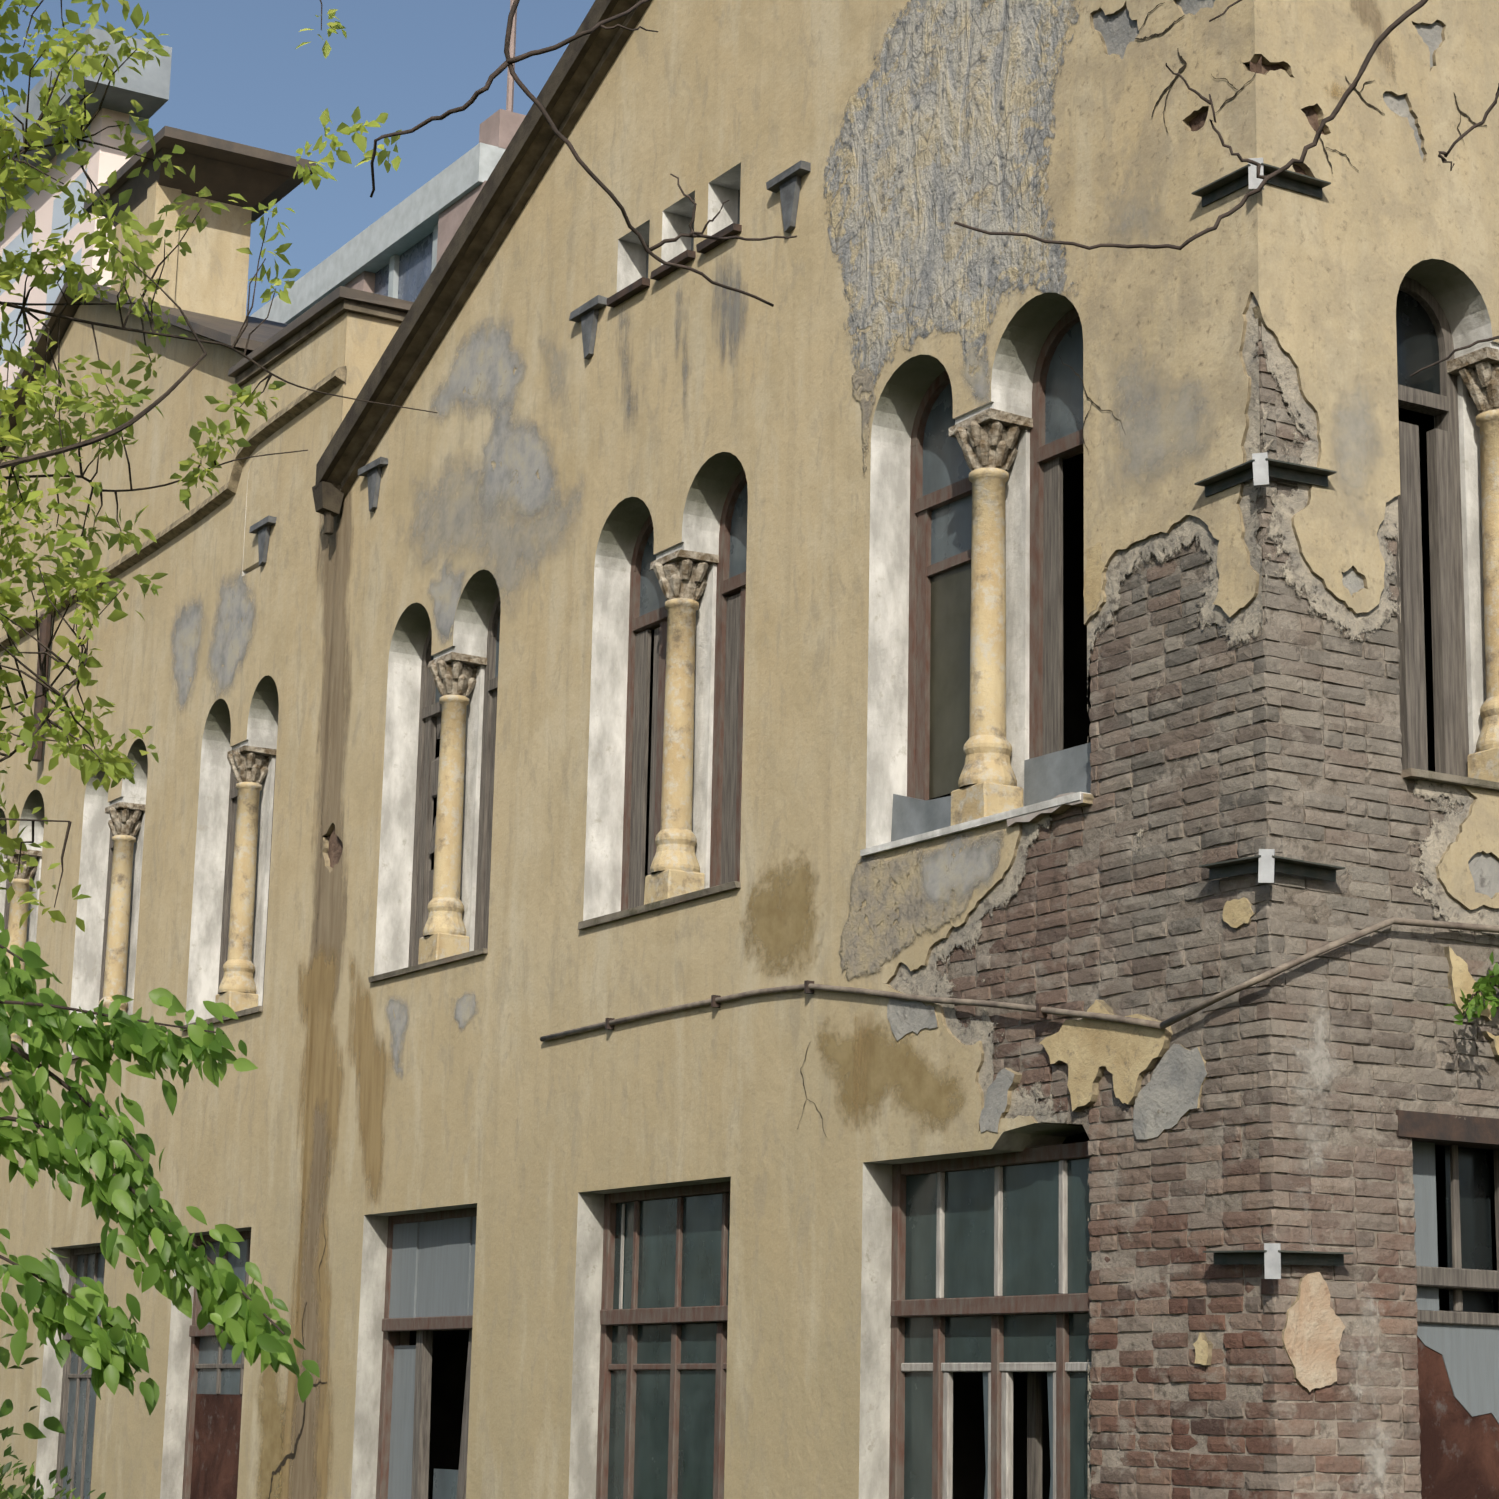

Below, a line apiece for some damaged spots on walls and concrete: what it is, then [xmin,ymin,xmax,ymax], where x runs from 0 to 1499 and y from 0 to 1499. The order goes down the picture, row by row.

flaking render [1176,0,1215,15]
flaking render [1249,56,1285,75]
flaking render [1414,21,1443,68]
flaking render [1189,108,1209,131]
flaking render [1301,106,1325,135]
flaking render [1383,93,1424,161]
peeling [823,0,1139,474]
water stain [745,864,814,974]
flaking render [839,293,1499,1499]
water stain [258,489,386,1499]
water stain [819,1027,963,1128]
crack [268,1221,327,1499]